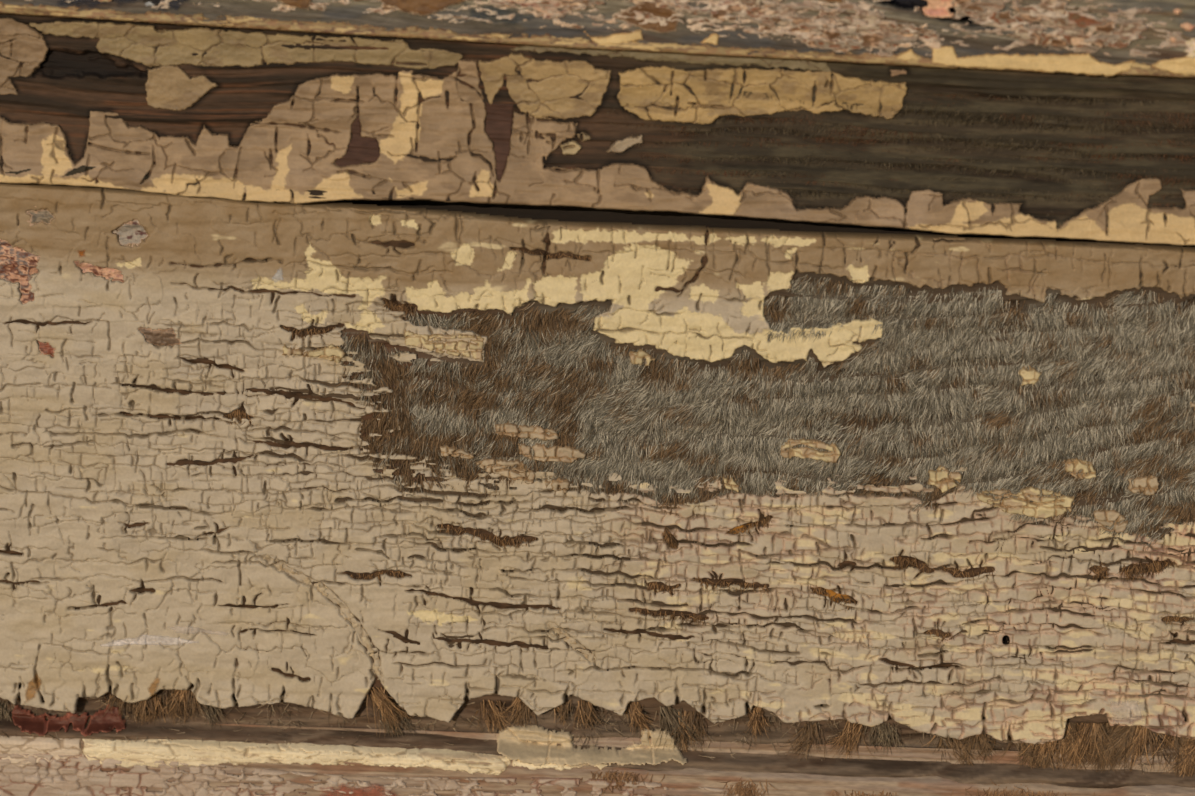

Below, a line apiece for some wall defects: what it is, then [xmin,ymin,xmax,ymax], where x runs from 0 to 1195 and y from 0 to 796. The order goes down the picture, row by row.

peeling [0,0,1195,125]
peeling [606,134,644,153]
crack [171,258,416,341]
crack [120,357,364,476]
crack [335,570,561,649]
crack [436,524,538,551]
crack [604,571,770,640]
crack [811,552,858,611]
crack [890,550,995,585]
crack [1086,555,1178,582]
crack [881,621,960,680]
peeling [0,724,687,796]